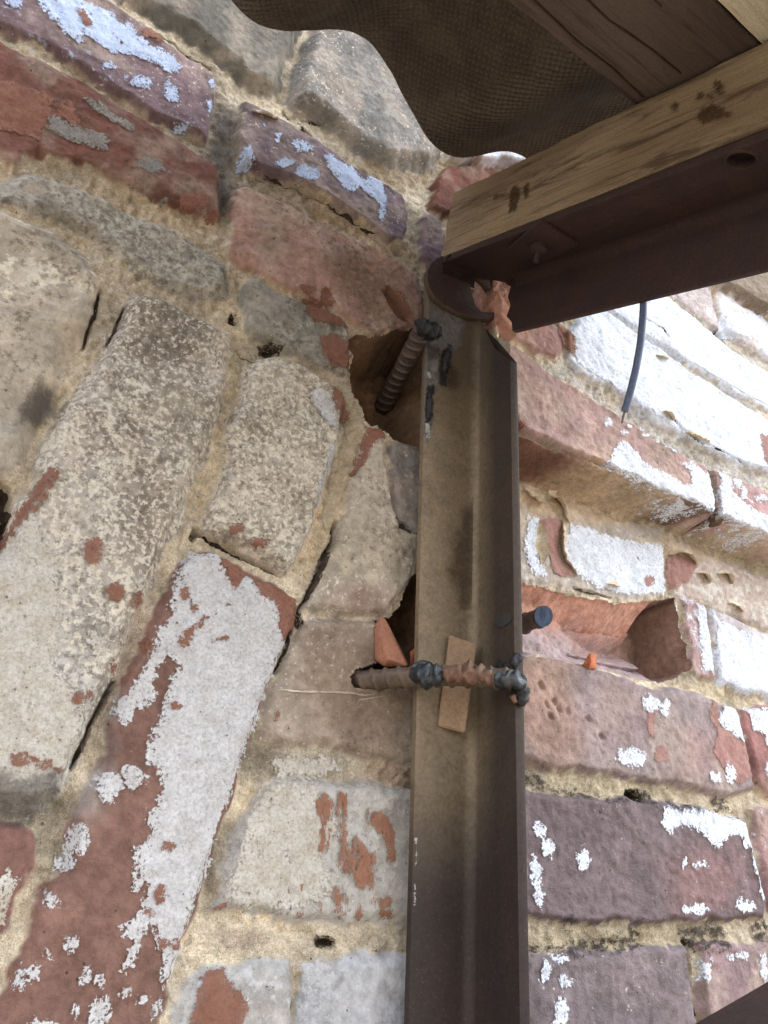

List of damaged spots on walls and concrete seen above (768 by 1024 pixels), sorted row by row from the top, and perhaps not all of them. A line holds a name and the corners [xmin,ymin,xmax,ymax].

crack [83,293,125,348]
spalling [298,284,432,477]
peeling [229,522,272,550]
peeling [521,297,768,769]
spalling [359,573,416,670]
crack [70,682,110,768]
peeling [709,700,752,787]